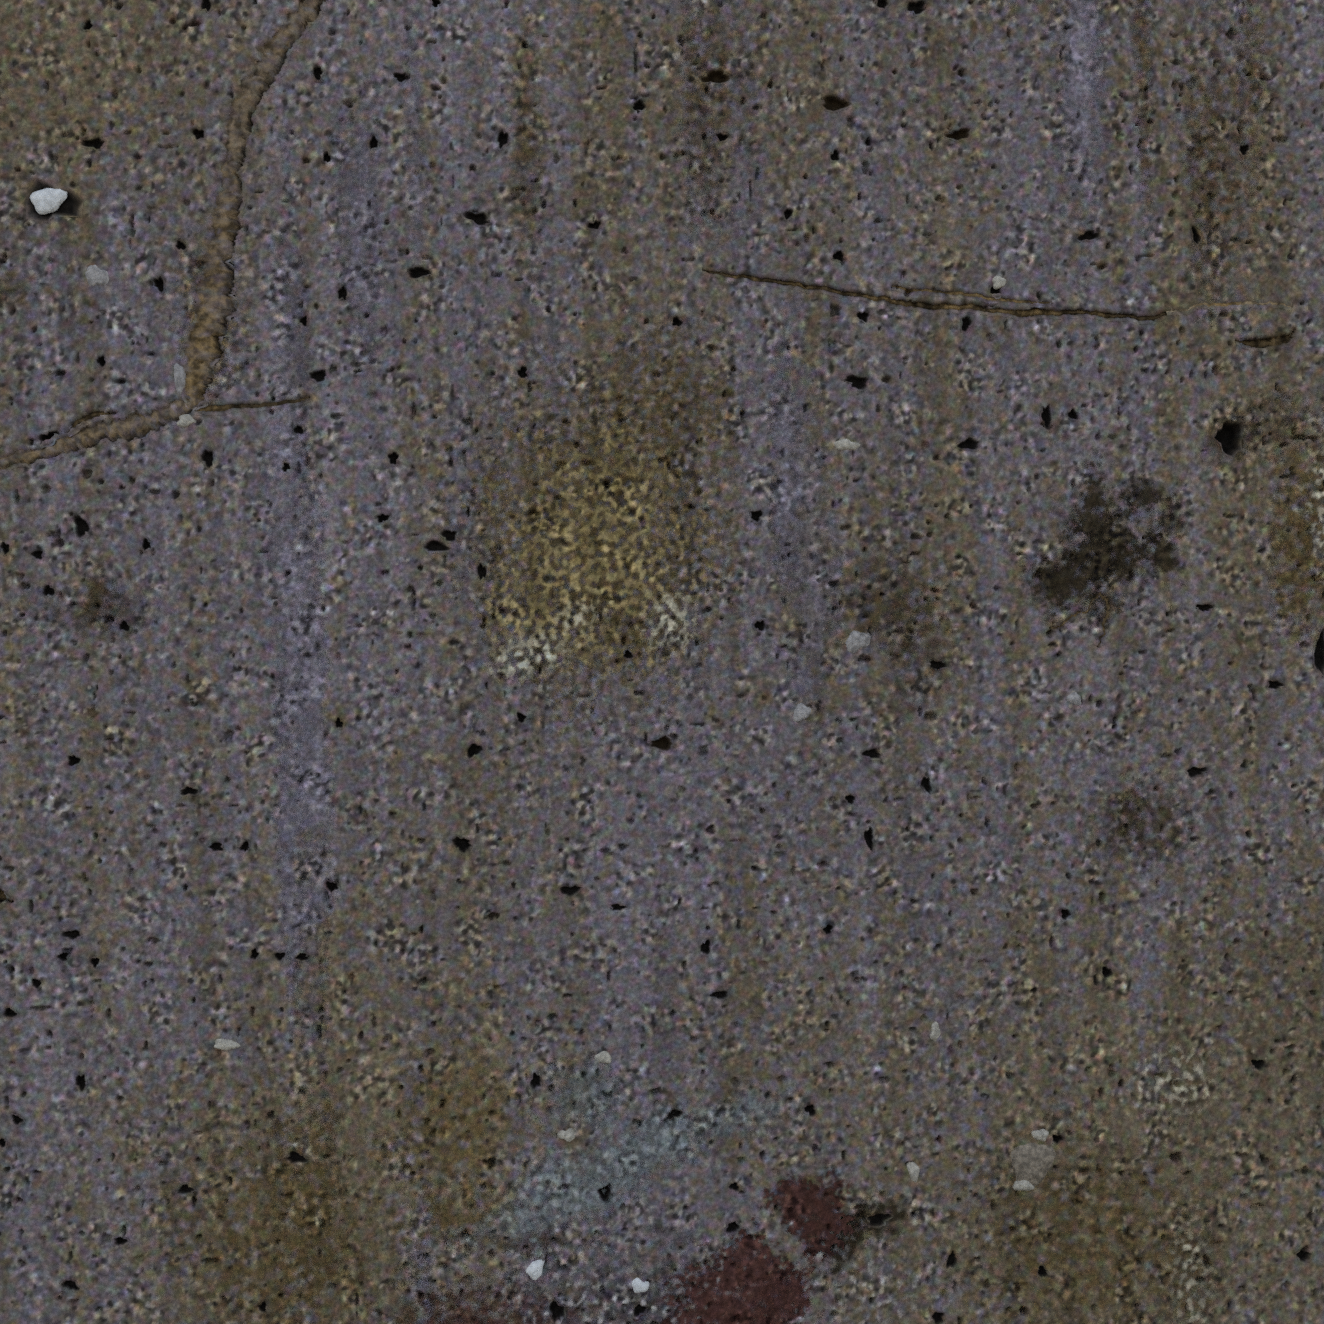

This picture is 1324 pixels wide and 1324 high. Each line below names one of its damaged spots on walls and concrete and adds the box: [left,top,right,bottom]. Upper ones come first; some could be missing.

crack [0,0,333,475]
crack [703,266,1298,352]
damp [1020,457,1185,621]
rust [426,1288,549,1324]
rust [652,1169,858,1324]